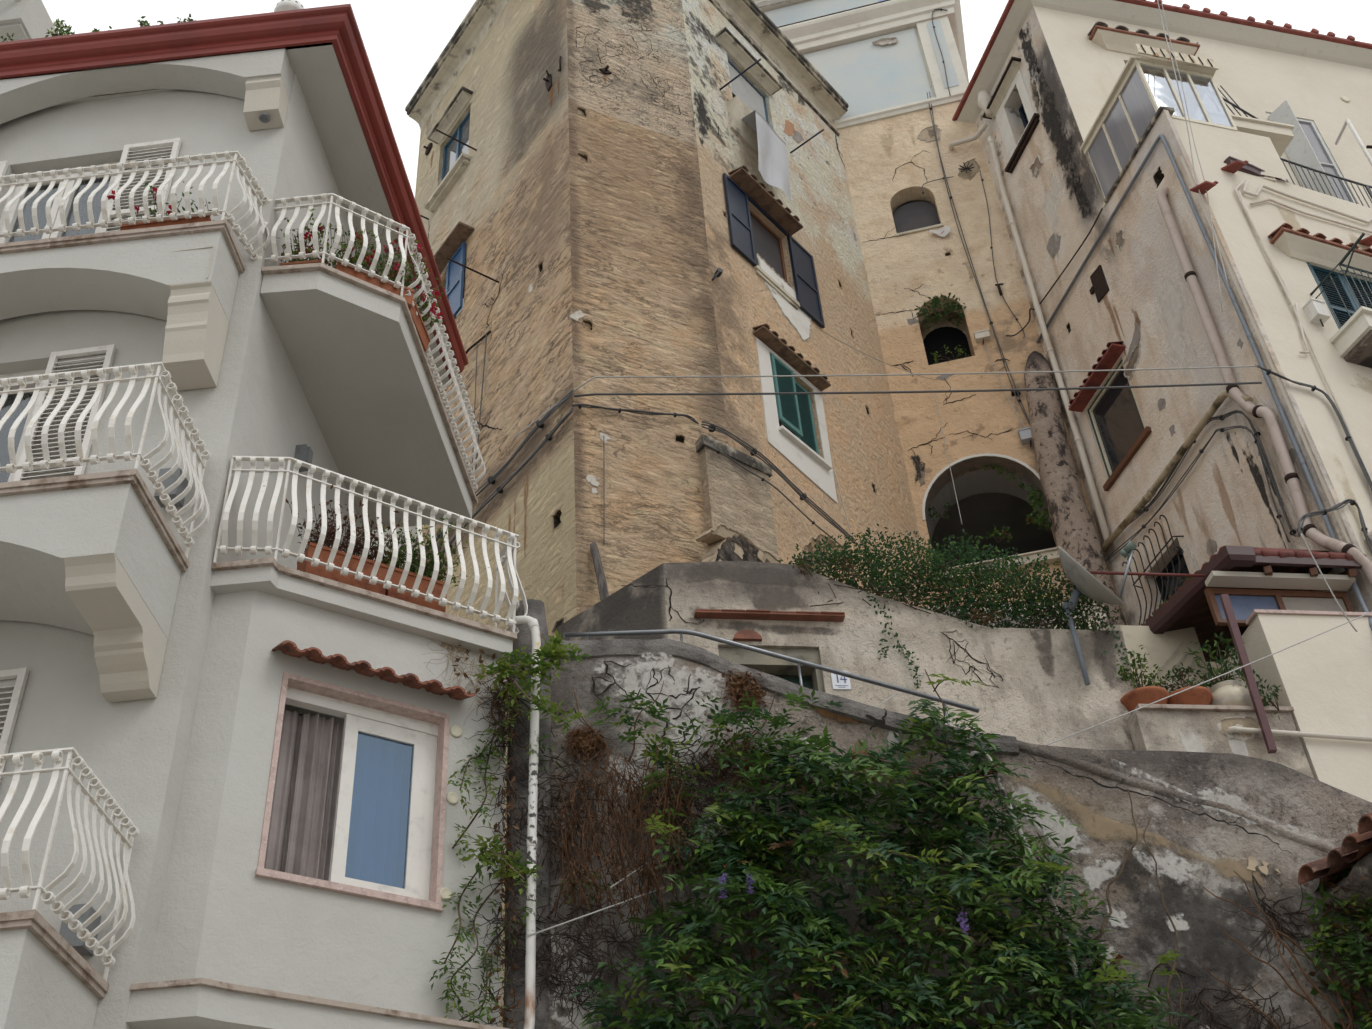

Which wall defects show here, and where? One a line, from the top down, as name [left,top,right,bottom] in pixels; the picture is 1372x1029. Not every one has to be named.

damp [1019,28,1091,235]
crack [892,361,1016,465]
crack [1027,753,1289,852]
crack [1252,875,1304,936]